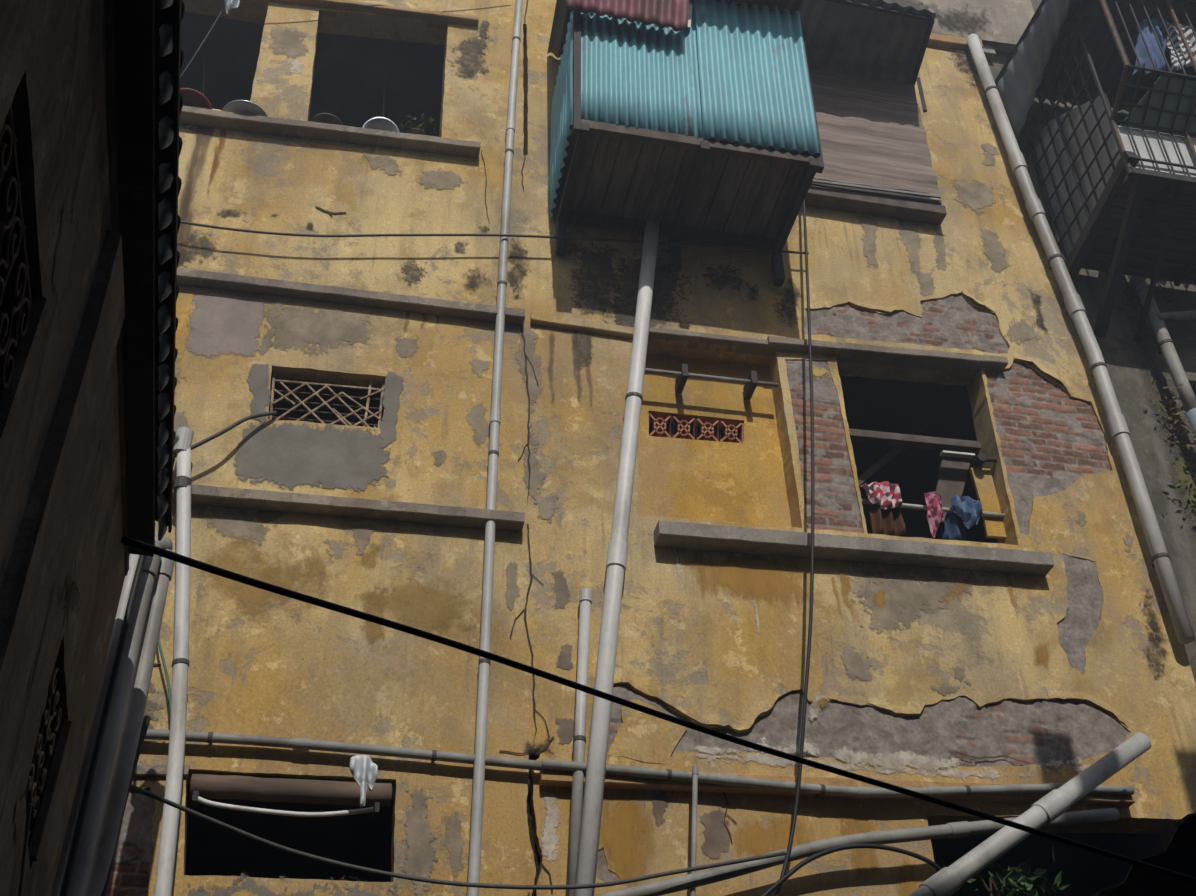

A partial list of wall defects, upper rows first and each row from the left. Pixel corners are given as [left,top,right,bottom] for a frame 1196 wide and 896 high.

water stain [177,124,219,265]
peeling [951,178,1011,273]
water stain [565,243,758,337]
water stain [775,279,802,327]
water stain [572,331,594,405]
flaking render [804,215,1111,535]
crack [499,325,555,896]
peeling [839,645,873,681]
peeling [850,567,987,647]
flaking render [1057,554,1103,675]
flaking render [607,666,1131,780]
flaking render [106,788,155,896]